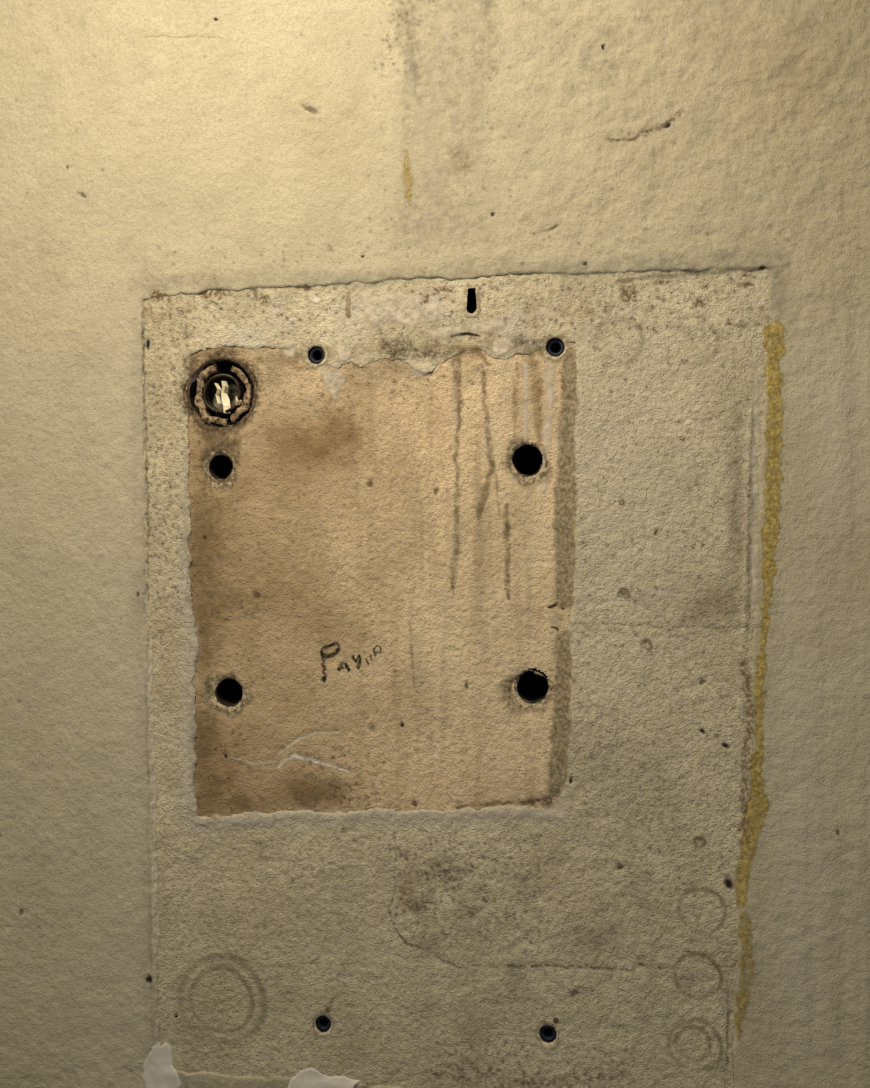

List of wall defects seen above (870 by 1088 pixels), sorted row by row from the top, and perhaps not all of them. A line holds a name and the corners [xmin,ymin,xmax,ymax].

water stain [477,370,494,519]
water stain [524,348,553,491]
peeling [137,262,772,1088]